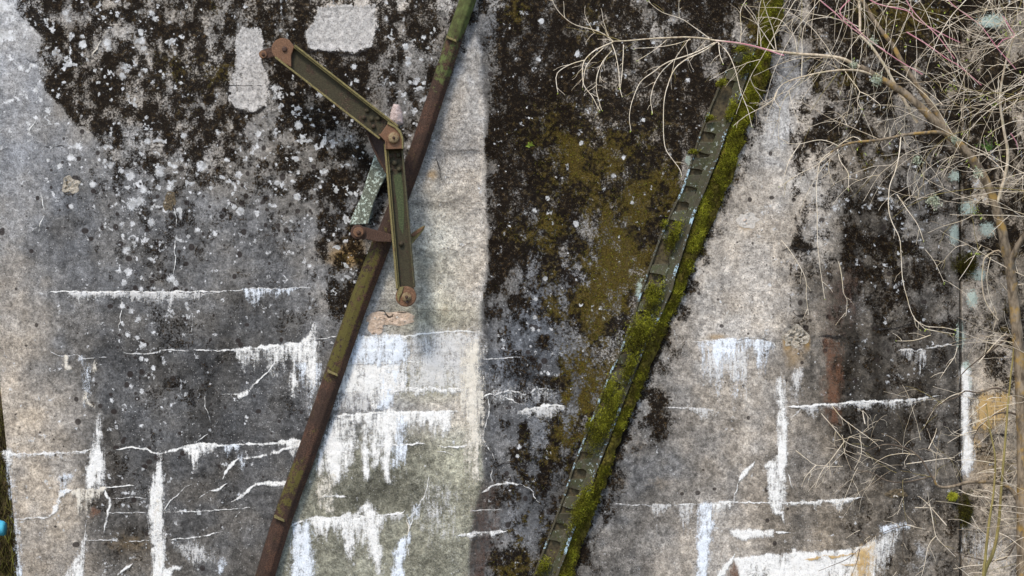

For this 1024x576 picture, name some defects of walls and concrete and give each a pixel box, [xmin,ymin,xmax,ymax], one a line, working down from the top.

water stain [51,287,309,309]
crack [819,332,845,340]
crack [235,361,276,398]
water stain [290,330,485,576]
crack [471,388,548,511]
crack [734,462,755,495]
crack [88,483,247,542]